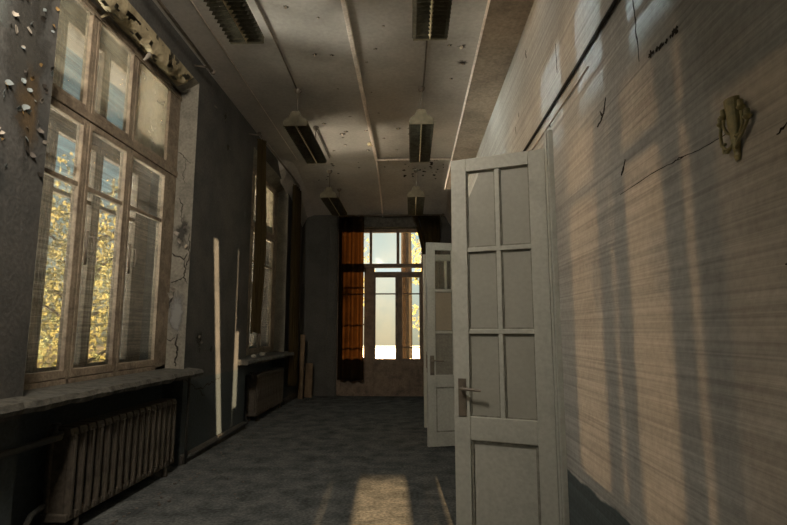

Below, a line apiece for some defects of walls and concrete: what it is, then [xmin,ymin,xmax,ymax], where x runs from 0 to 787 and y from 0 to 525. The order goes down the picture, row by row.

crack [631,0,639,60]